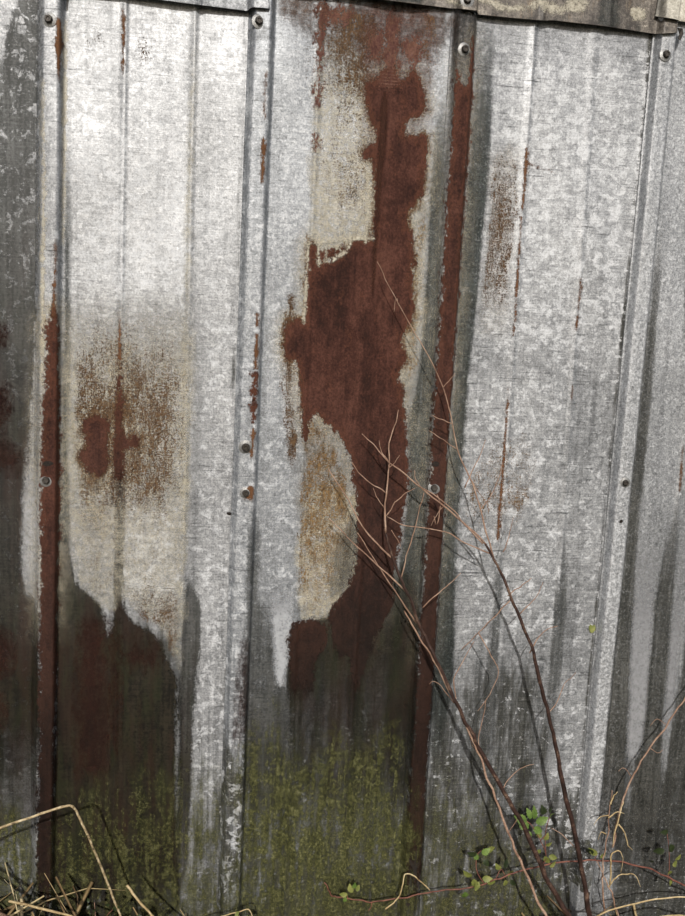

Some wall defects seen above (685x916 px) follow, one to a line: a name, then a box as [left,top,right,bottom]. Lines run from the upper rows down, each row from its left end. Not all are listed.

leakage [0,0,47,795]
rust [31,248,192,916]
leakage [52,222,202,906]
rust [277,0,453,697]
rust [404,35,476,909]
leakage [599,291,685,845]